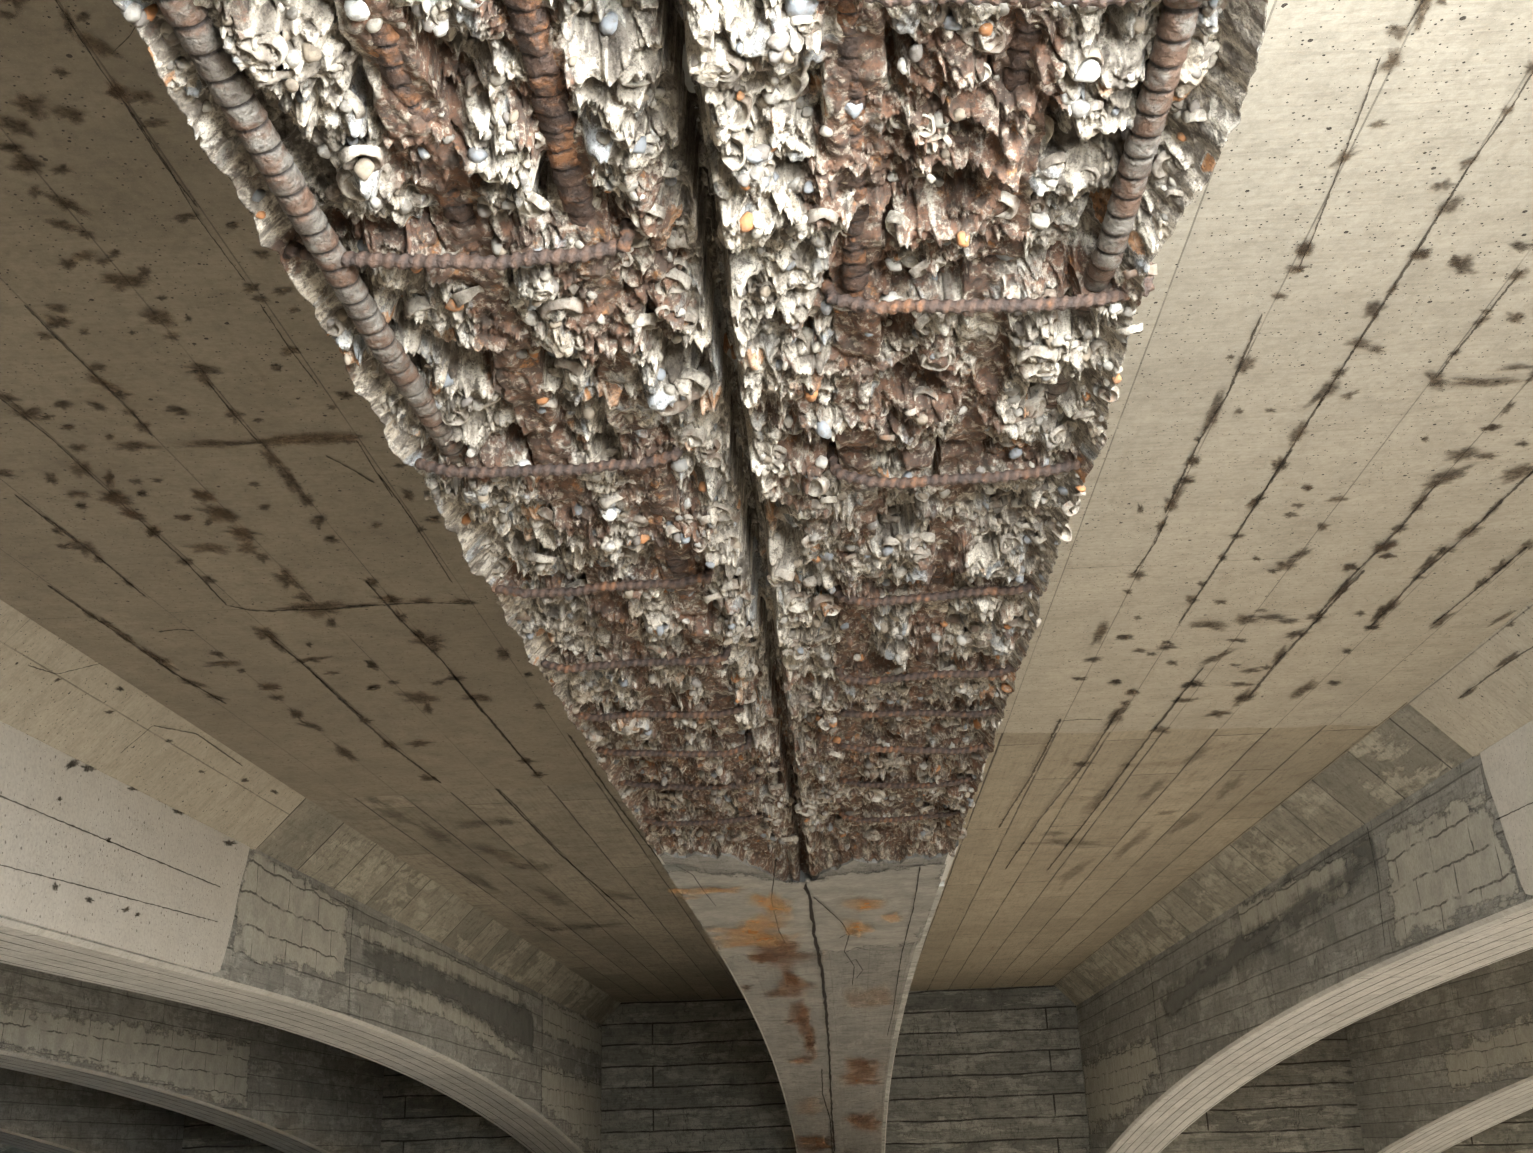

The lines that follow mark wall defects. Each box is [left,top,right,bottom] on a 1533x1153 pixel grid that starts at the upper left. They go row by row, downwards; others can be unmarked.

water stain [1382,0,1446,70]
crack [1179,58,1533,627]
crack [0,398,537,783]
water stain [177,490,444,652]
spalling [112,0,1268,959]
crack [1134,314,1262,573]
water stain [1157,394,1243,530]
water stain [1193,609,1323,717]
water stain [1376,448,1495,558]
crack [0,795,220,922]
corrosion [757,942,816,1064]
crack [771,859,921,1153]